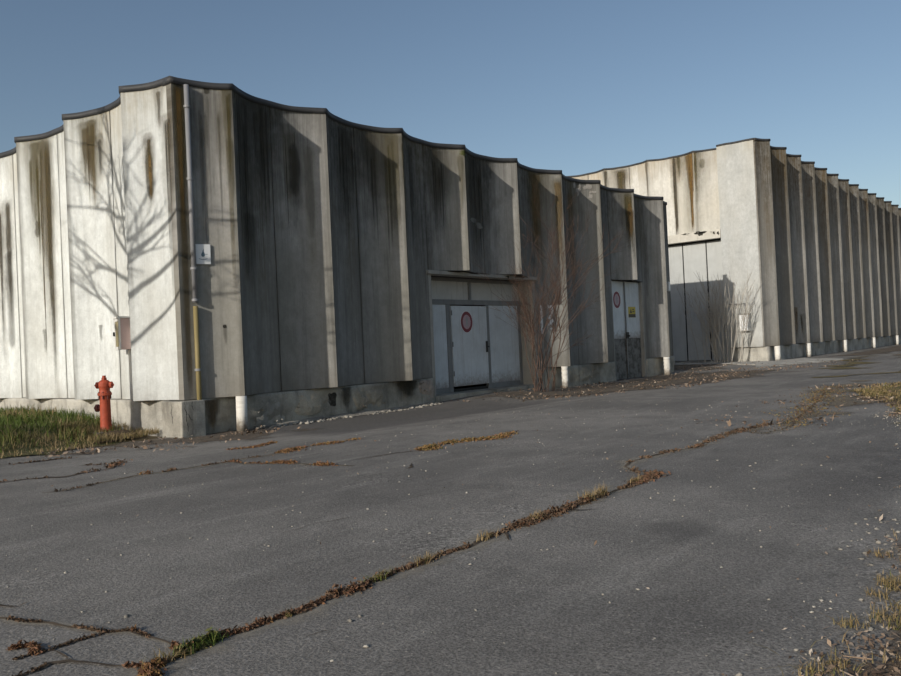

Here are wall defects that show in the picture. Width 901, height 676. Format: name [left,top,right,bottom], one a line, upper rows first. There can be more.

water stain [82,126,95,176]
rust [685,153,696,226]
water stain [0,204,12,290]
water stain [30,142,55,333]